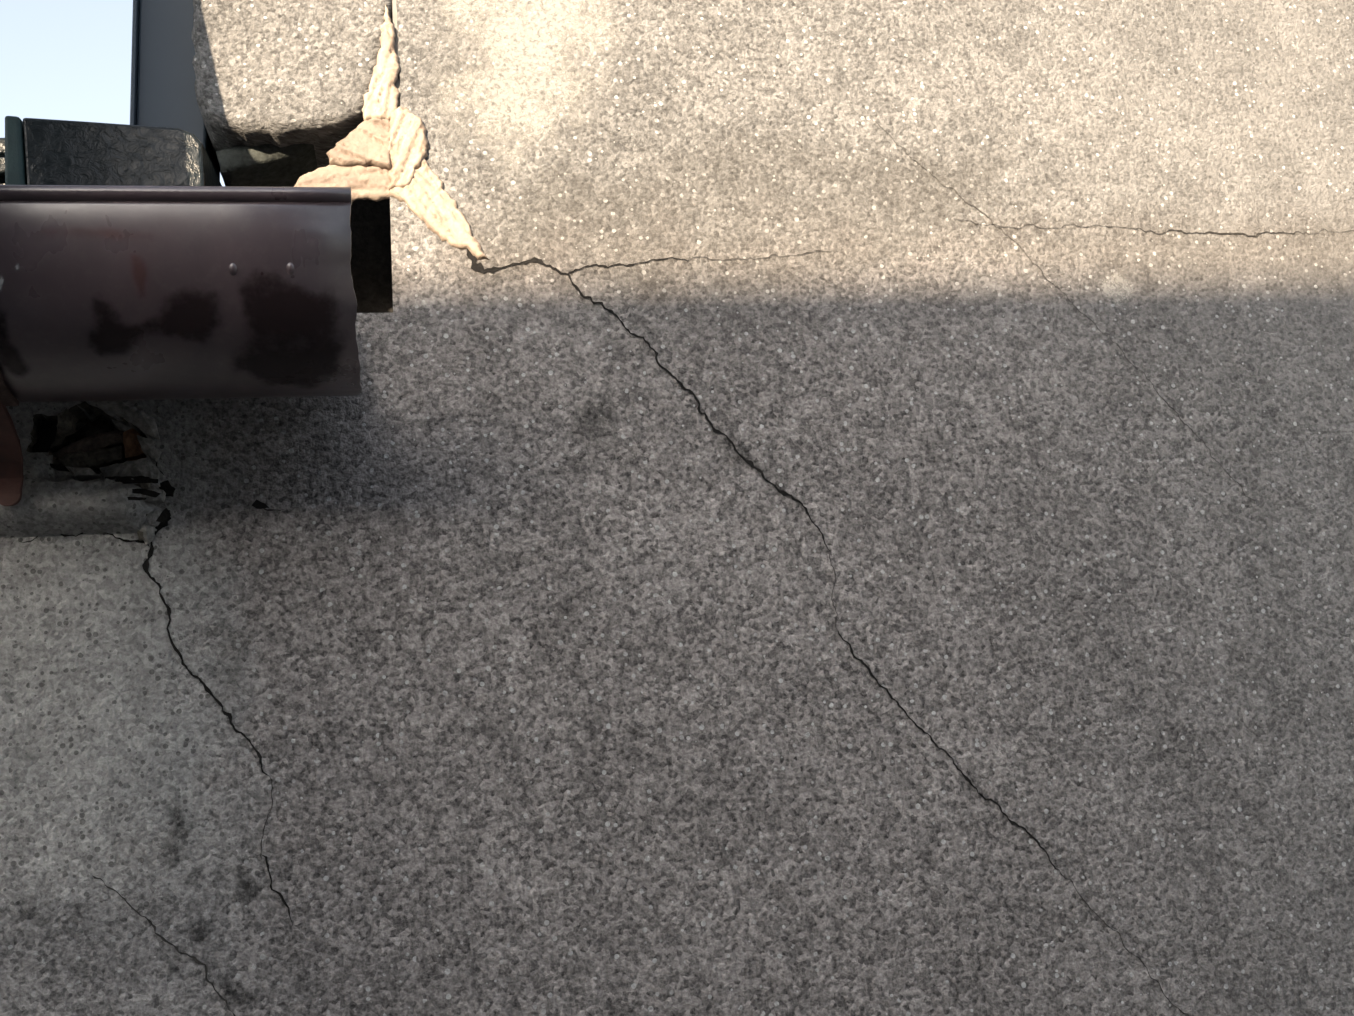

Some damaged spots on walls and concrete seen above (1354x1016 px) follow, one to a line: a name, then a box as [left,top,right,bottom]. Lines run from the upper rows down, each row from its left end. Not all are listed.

spalling [26,401,175,545]
crack [22,510,293,925]
crack [467,249,1189,1016]
crack [873,117,1354,502]
crack [93,876,235,1016]